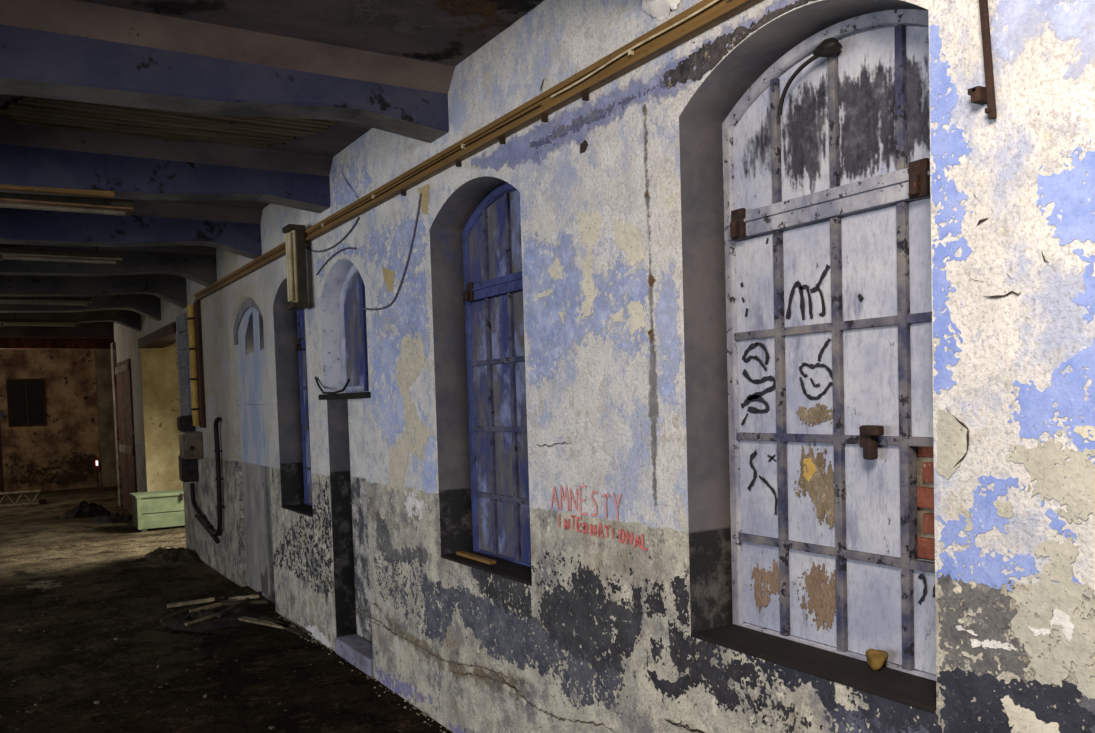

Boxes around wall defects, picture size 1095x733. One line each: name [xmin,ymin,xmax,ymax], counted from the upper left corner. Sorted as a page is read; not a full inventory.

peeling [317,184,437,521]
leakage [403,0,541,61]
peeling [523,211,680,404]
leakage [471,0,799,238]
leakage [648,287,658,505]
peeling [930,24,973,394]
peeling [1036,139,1095,324]
flaking render [373,338,1095,733]
leakage [377,606,522,699]
crack [352,603,618,733]
crack [664,719,705,733]